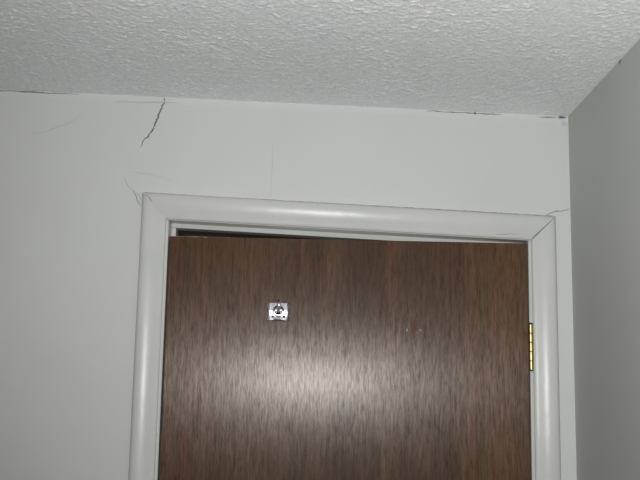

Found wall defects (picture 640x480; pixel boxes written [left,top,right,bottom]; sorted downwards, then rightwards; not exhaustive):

crack [142,98,171,145]